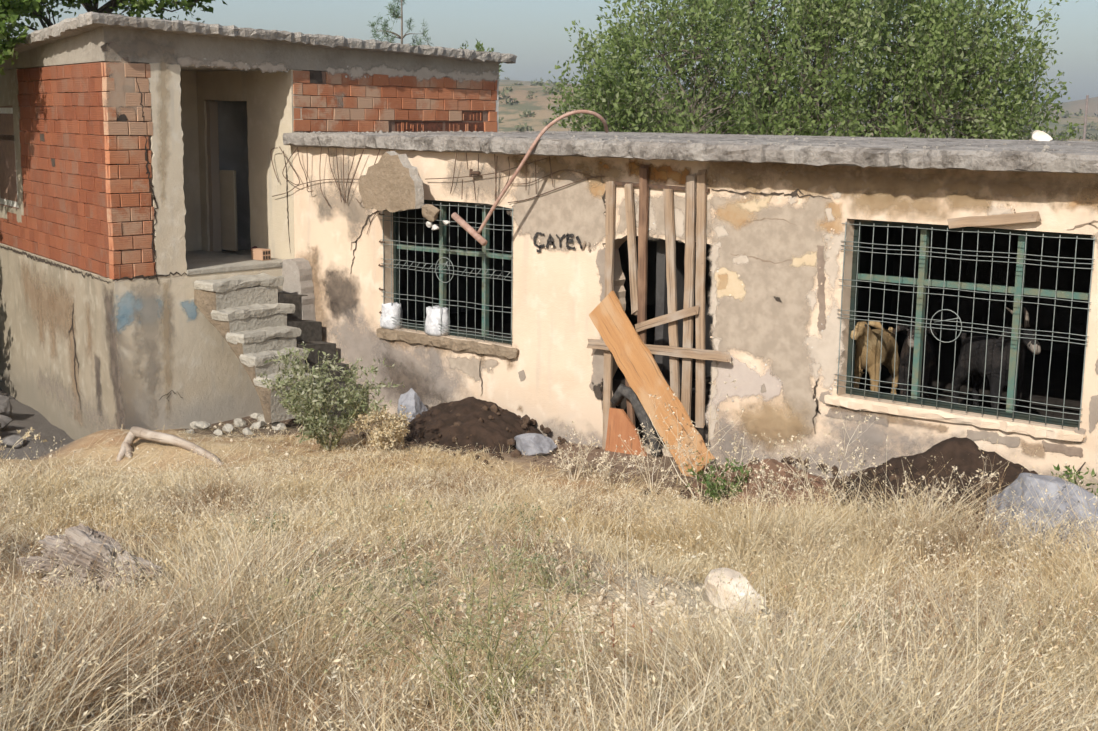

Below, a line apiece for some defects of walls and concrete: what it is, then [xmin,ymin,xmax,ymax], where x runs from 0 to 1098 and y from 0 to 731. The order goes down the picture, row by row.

crack [0,77,188,284]
leakage [23,269,197,429]
crack [350,211,379,274]
leakage [306,257,460,406]
flaking render [270,147,947,440]
crack [711,189,831,225]
leakage [709,162,1098,214]
spalling [1022,441,1044,457]